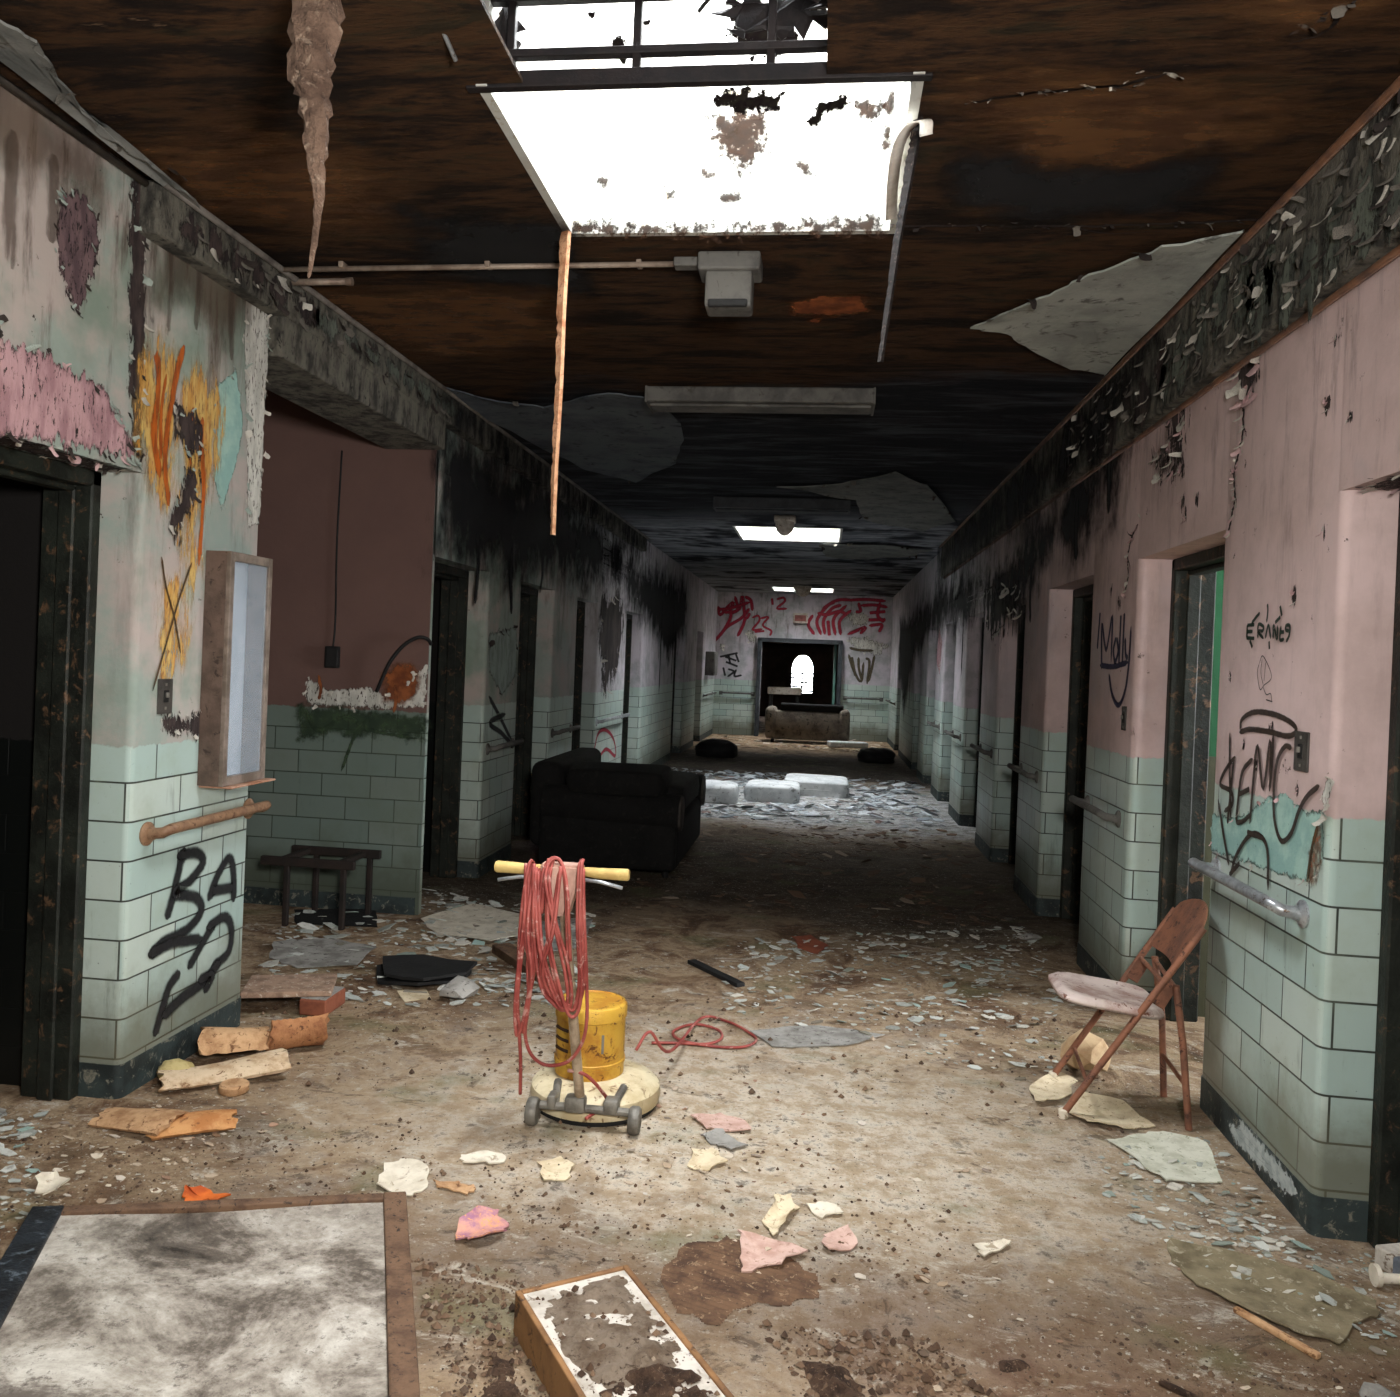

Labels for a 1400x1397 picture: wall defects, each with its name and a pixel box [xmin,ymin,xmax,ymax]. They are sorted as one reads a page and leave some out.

peeling [0,20,684,547]
peeling [970,89,1400,524]
peeling [1209,776,1335,885]